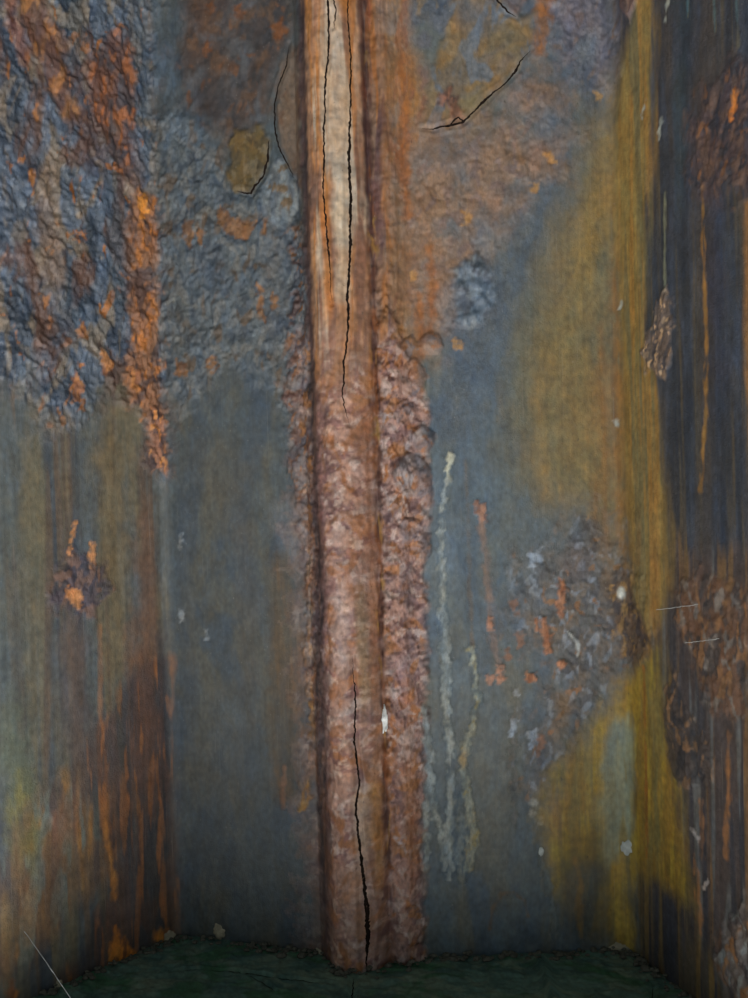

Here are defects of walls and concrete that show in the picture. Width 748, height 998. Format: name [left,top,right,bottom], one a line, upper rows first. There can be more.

rust [0,519,185,998]
rust [0,0,189,479]
rust [181,204,268,251]
crack [238,49,295,194]
rust [254,279,281,325]
crack [322,0,353,422]
rust [268,0,443,964]
crack [422,51,530,130]
rust [471,499,528,687]
rust [493,0,748,998]